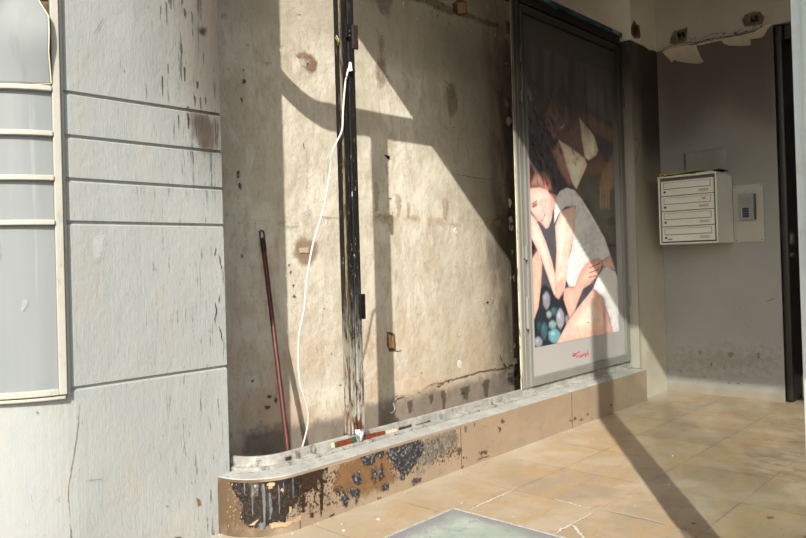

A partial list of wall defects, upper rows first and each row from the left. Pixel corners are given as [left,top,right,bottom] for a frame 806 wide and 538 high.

peeling [631,11,771,64]
water stain [365,371,521,430]
water stain [246,418,349,455]
peeling [269,506,302,529]